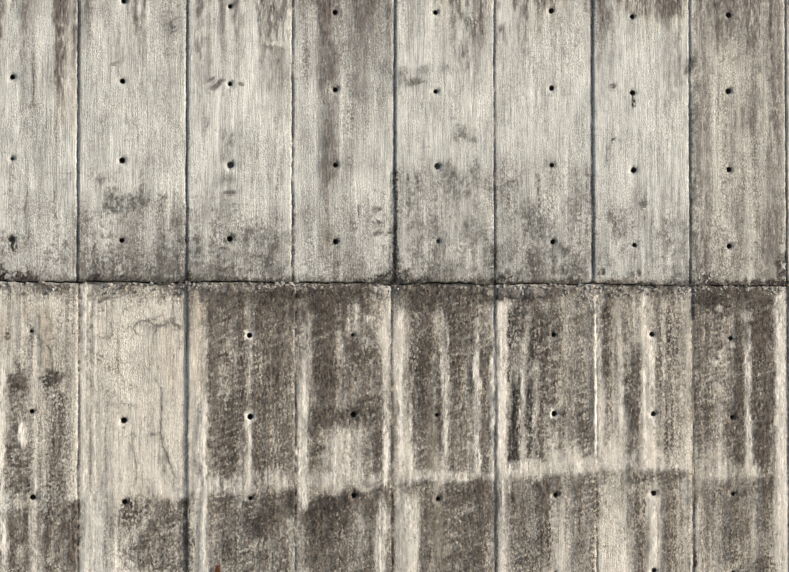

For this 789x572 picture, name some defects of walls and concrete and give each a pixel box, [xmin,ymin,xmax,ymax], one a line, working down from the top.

damp [452,0,486,36]
damp [600,0,682,40]
damp [53,0,77,100]
damp [318,0,338,209]
damp [384,61,427,93]
damp [679,56,709,153]
damp [697,0,789,180]
damp [103,174,150,216]
damp [689,162,710,216]
crack [133,293,181,335]